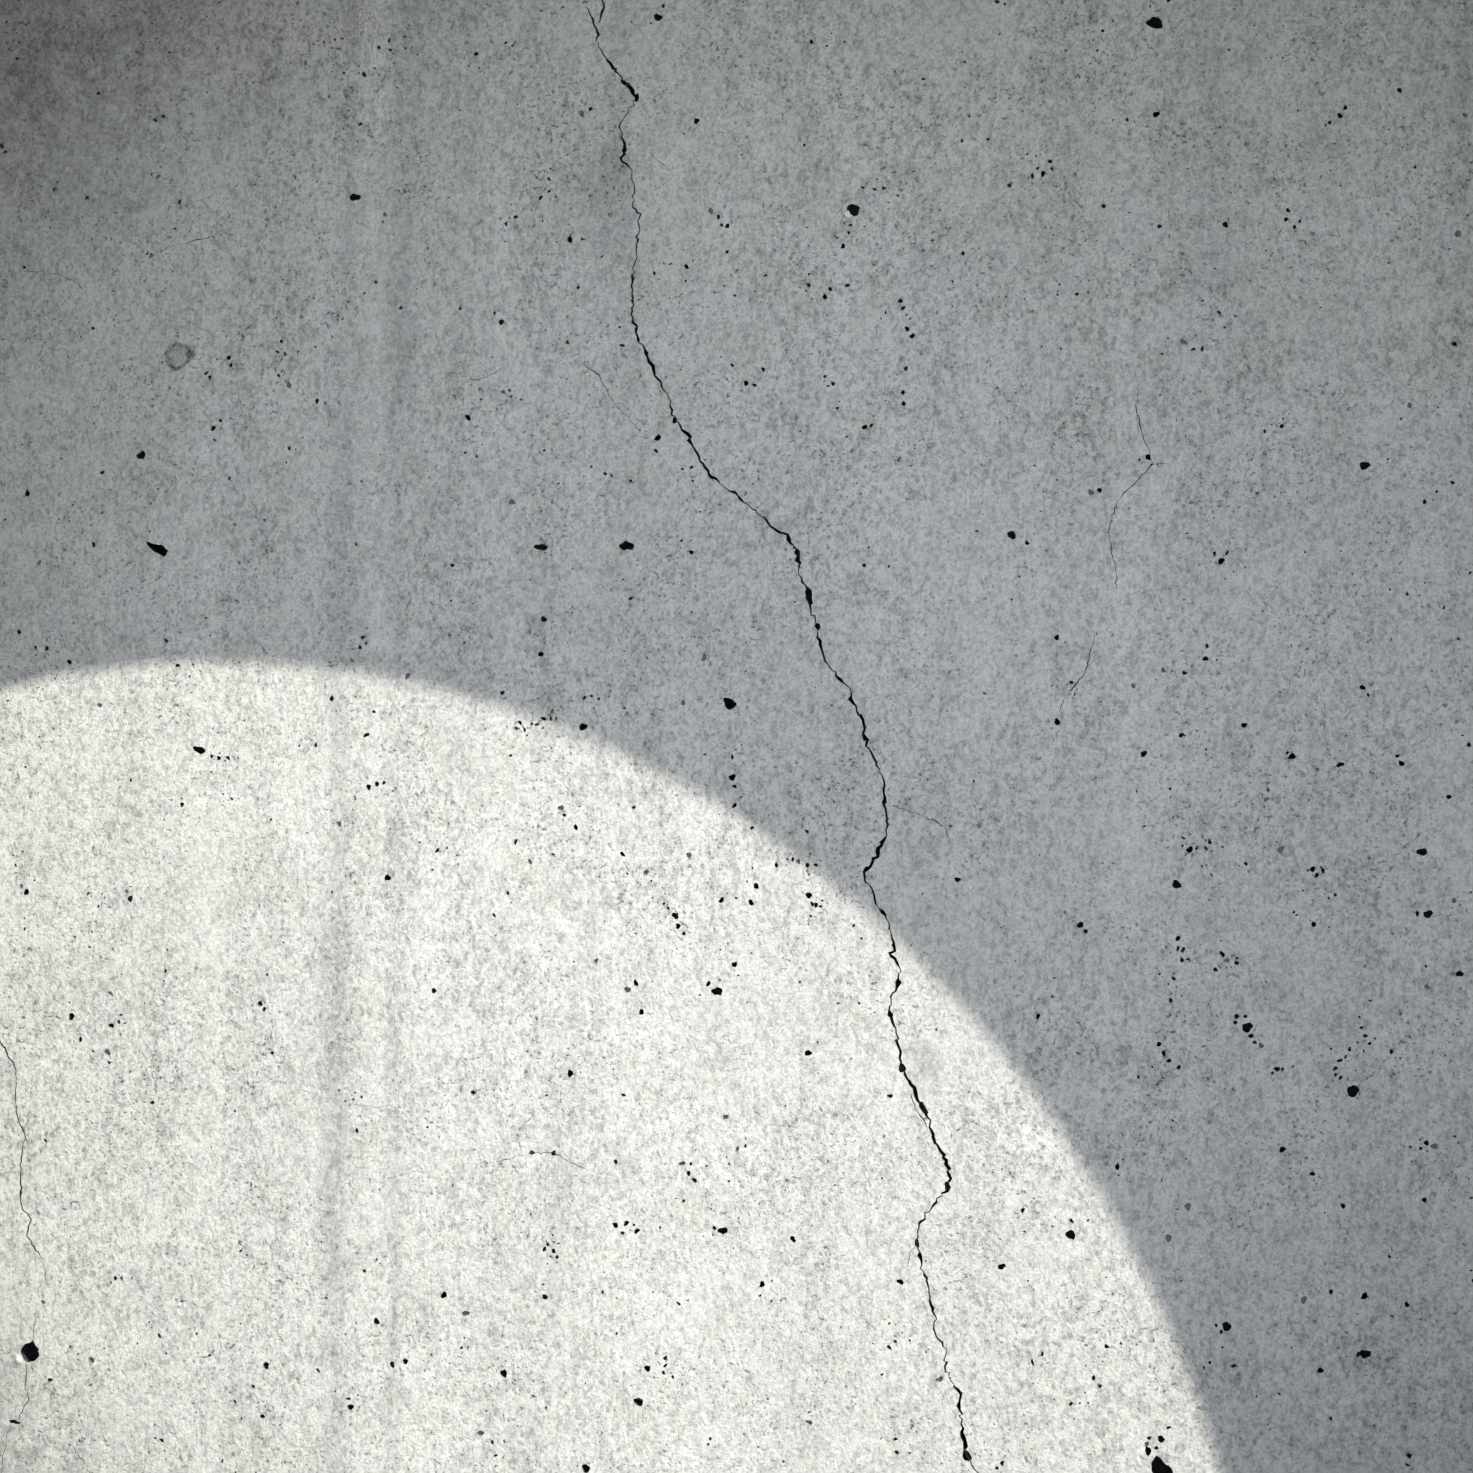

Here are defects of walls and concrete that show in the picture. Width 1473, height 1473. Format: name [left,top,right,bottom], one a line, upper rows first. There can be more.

crack [582,0,979,1473]